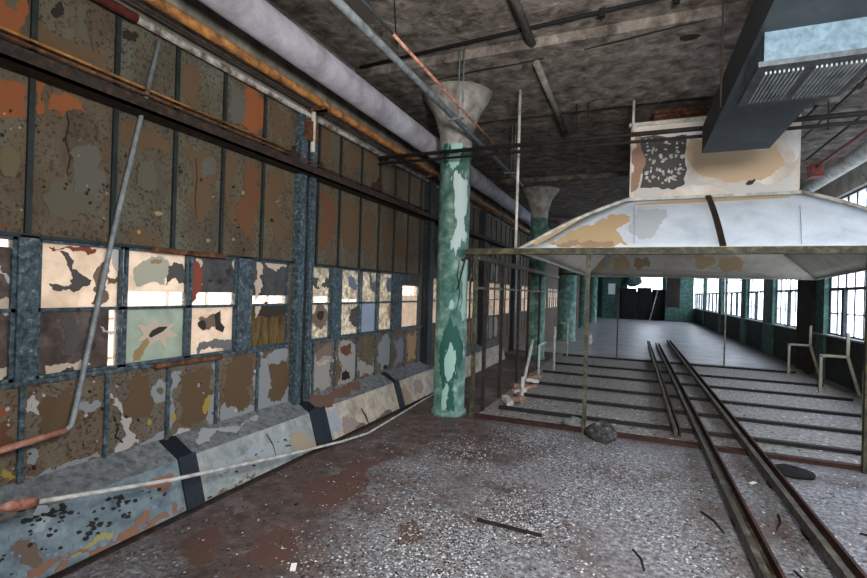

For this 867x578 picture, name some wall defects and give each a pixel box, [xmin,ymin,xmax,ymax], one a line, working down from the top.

corrosion [0,0,29,48]
corrosion [0,78,85,118]
peeling [634,125,800,198]
peeling [0,296,9,316]
peeling [49,246,203,305]
peeling [437,142,498,412]
peeling [26,392,40,415]
peeling [79,371,191,453]
peeling [204,348,288,426]
peeling [0,503,80,568]
peeling [76,488,167,541]
peeling [275,424,745,578]